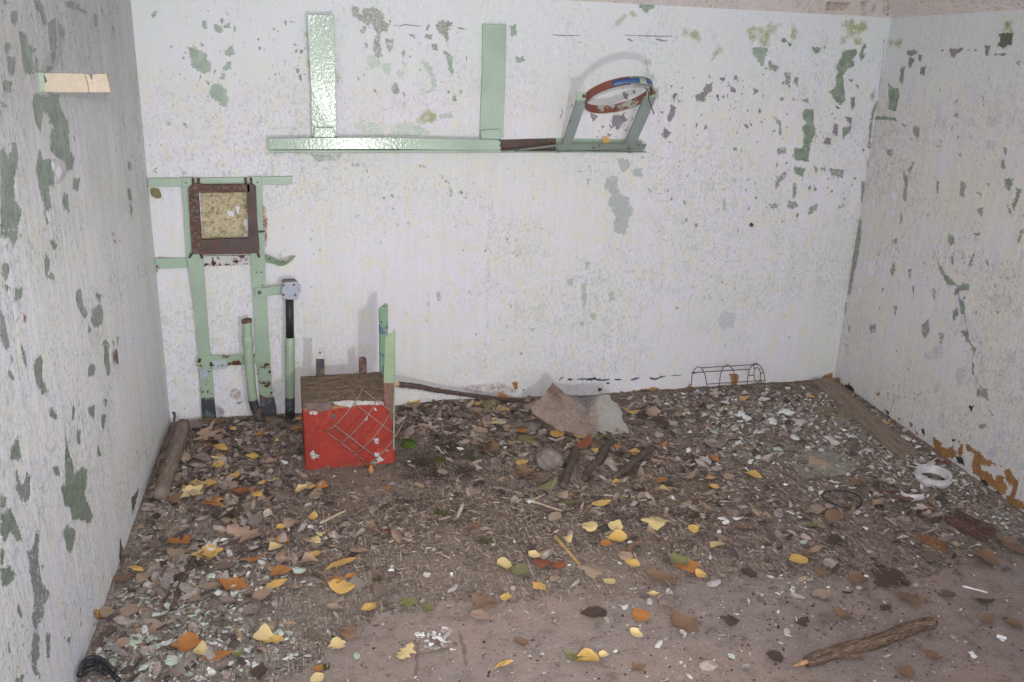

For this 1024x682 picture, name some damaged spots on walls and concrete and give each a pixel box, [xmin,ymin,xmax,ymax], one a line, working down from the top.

peeling [0,142,23,247]
peeling [33,93,80,225]
peeling [182,10,236,107]
peeling [351,6,467,119]
peeling [658,44,876,352]
peeling [862,49,931,168]
peeling [941,23,1013,58]
peeling [0,310,59,420]
peeling [932,234,999,388]
crack [955,284,989,402]
peeling [53,404,93,553]
peeling [0,436,51,682]